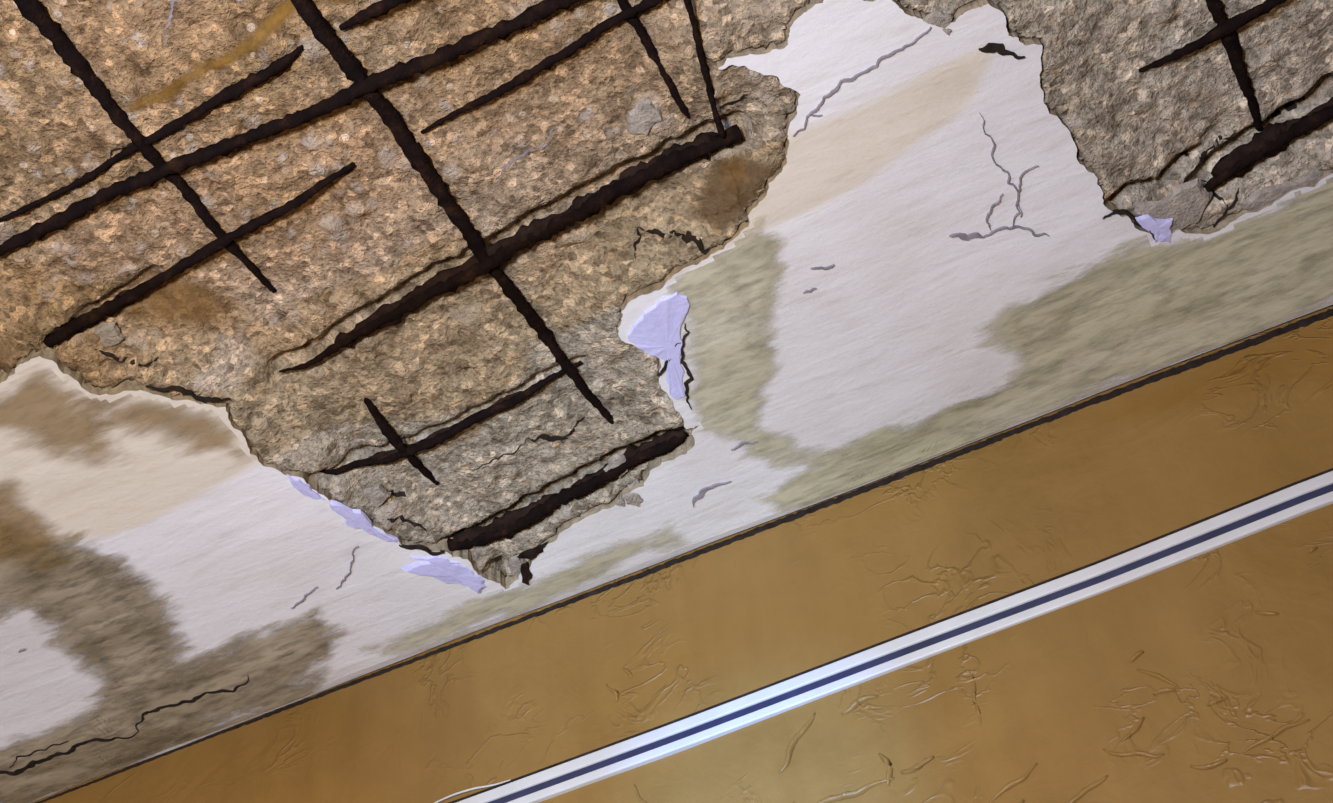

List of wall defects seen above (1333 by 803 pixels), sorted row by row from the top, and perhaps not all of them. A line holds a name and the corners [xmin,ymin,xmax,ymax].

corrosion [130,0,295,110]
spalling [896,0,973,35]
corrosion [697,160,776,229]
crack [949,114,1049,241]
spalling [993,0,1333,243]
spalling [0,0,810,593]
water stain [725,238,779,358]
water stain [1157,206,1333,321]
water stain [0,376,228,452]
water stain [929,339,1126,434]
water stain [0,486,323,746]
crack [0,309,1333,803]